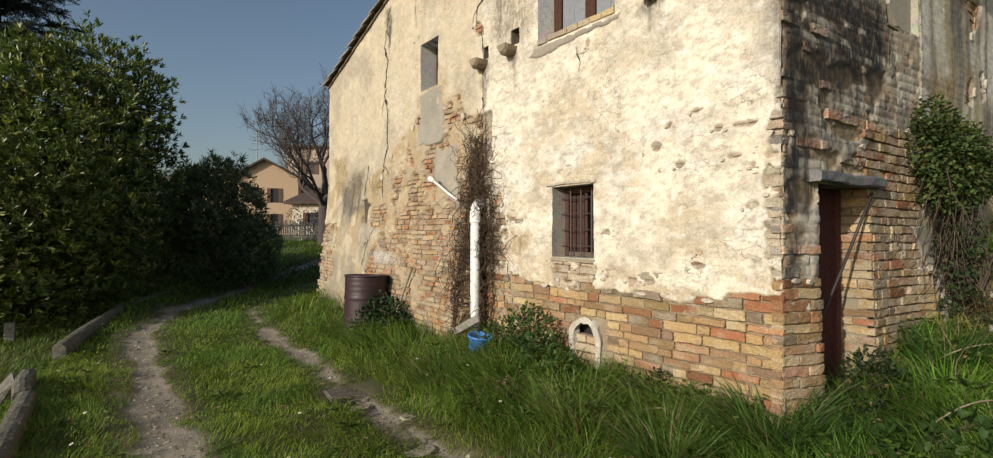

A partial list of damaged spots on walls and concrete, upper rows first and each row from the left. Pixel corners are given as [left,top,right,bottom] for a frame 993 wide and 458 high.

crack [364,9,390,197]
leakage [784,0,886,212]
flaking render [316,224,338,291]
flaking render [362,68,829,428]